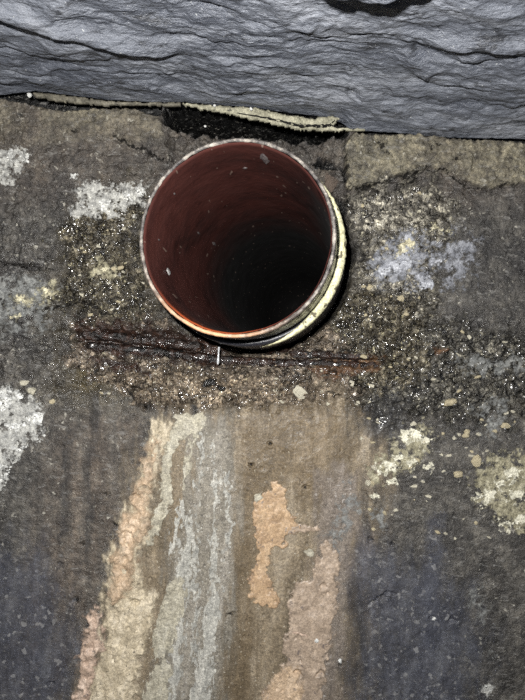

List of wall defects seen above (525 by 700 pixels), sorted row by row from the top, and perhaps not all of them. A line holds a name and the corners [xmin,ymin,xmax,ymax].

leakage [0,146,30,186]
leakage [67,173,148,225]
leakage [366,222,481,293]
corrosion [73,318,225,376]
leakage [0,385,46,491]
leakage [468,448,525,535]
leakage [132,382,438,700]
peeling [247,481,341,700]